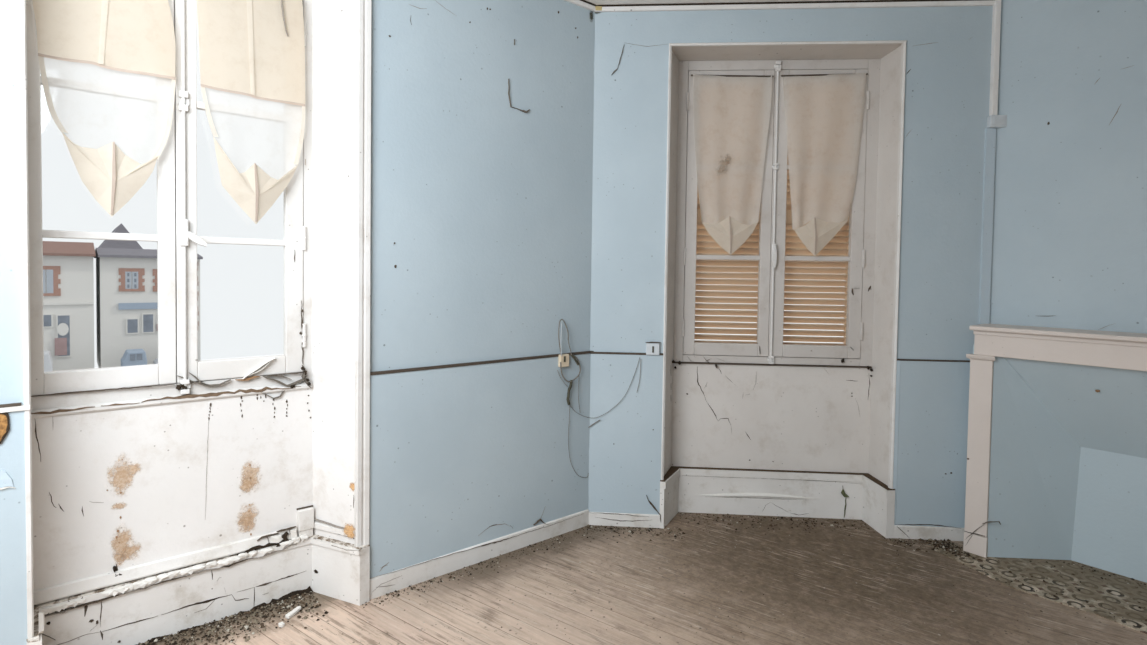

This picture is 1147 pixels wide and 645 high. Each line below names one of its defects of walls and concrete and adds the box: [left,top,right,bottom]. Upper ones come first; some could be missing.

spalling [0,412,10,444]
crack [690,356,757,440]
crack [236,498,360,555]
crack [370,513,648,579]
peeling [38,535,308,634]
crack [57,570,305,645]